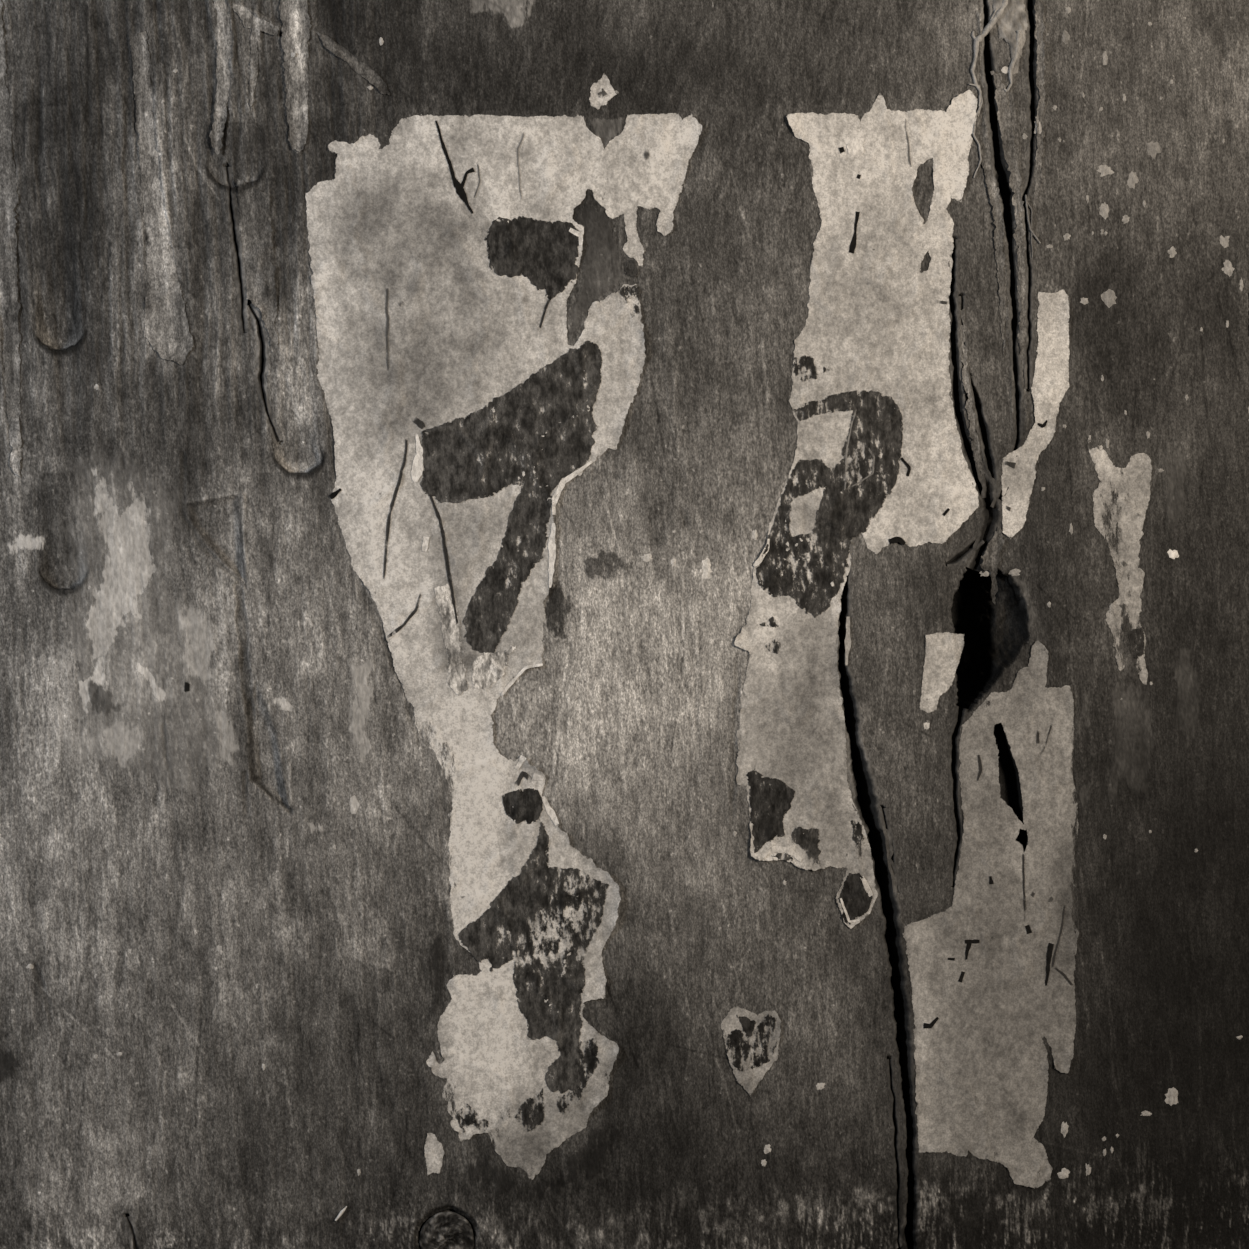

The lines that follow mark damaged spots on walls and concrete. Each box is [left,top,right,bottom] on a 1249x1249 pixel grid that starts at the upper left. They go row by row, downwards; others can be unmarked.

crack [945,0,1041,573]
crack [837,533,921,1249]